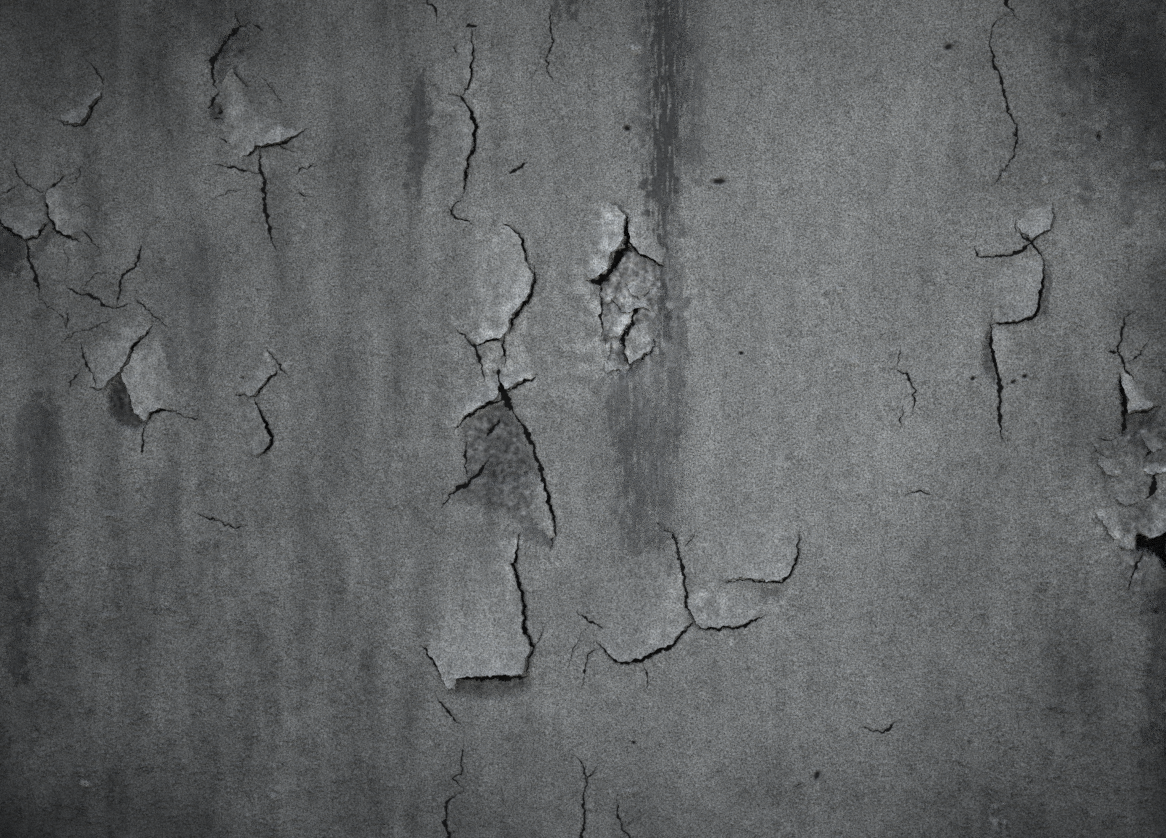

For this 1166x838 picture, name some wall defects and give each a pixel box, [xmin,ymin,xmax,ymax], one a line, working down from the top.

crack [545,13,556,84]
crack [989,0,1019,183]
peeling [0,158,200,455]
crack [448,201,472,225]
peeling [585,202,673,378]
damp [605,0,704,552]
peeling [970,198,1053,439]
peeling [421,223,556,696]
peeling [1094,309,1166,615]
peeling [567,516,800,690]
crack [435,695,464,838]
crack [574,755,597,838]